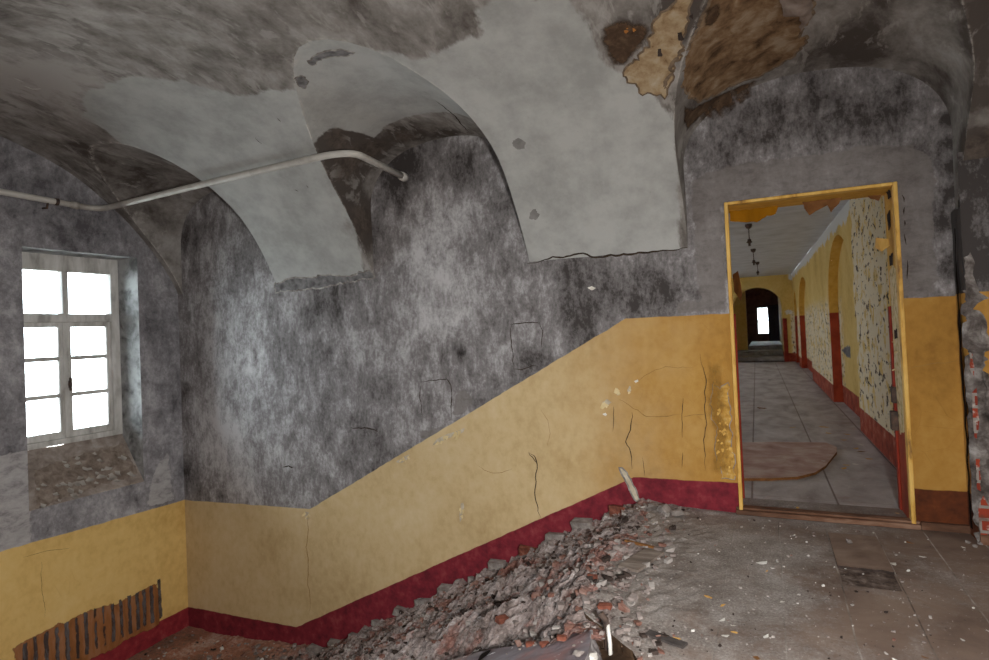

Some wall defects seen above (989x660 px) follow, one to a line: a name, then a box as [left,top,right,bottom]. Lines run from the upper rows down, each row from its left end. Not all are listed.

flaking render [622,0,816,103]
peeling [868,190,905,434]
crack [528,412,550,513]
crack [613,357,707,473]
flaking render [960,253,989,541]